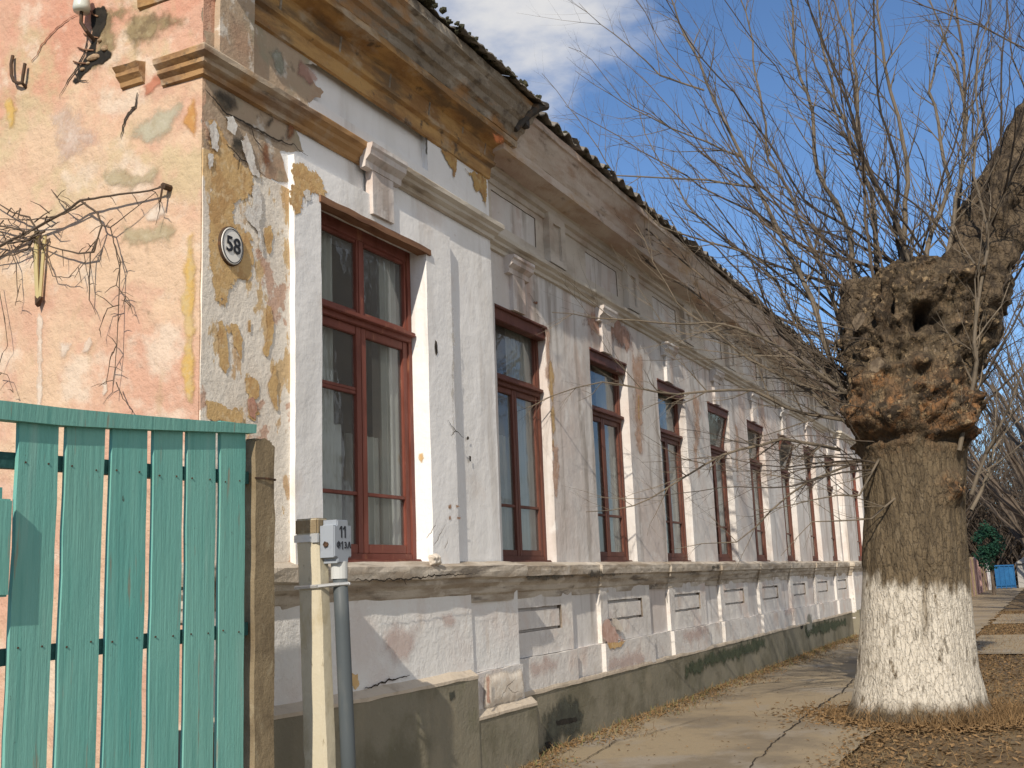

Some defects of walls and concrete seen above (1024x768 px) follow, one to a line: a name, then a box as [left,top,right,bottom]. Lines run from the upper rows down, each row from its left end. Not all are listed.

crack [120,93,138,137]
crack [205,89,308,176]
spalling [208,116,273,306]
spalling [288,162,327,215]
spalling [205,305,279,423]
spalling [602,618,626,649]
crack [365,675,409,688]